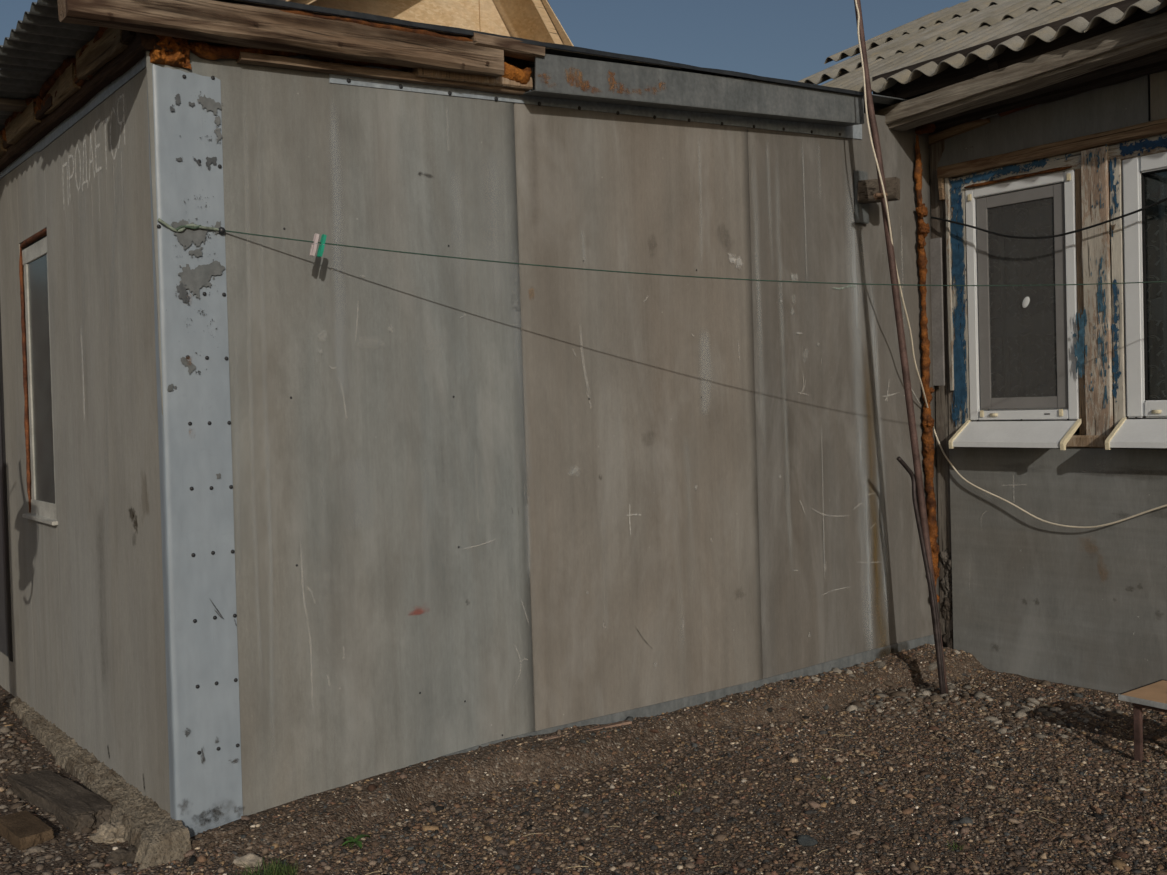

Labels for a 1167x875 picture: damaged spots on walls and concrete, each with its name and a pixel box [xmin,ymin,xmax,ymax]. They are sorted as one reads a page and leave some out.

peeling [170,91,223,170]
peeling [1086,135,1167,237]
peeling [171,218,225,329]
peeling [949,154,1072,427]
peeling [1071,256,1122,409]